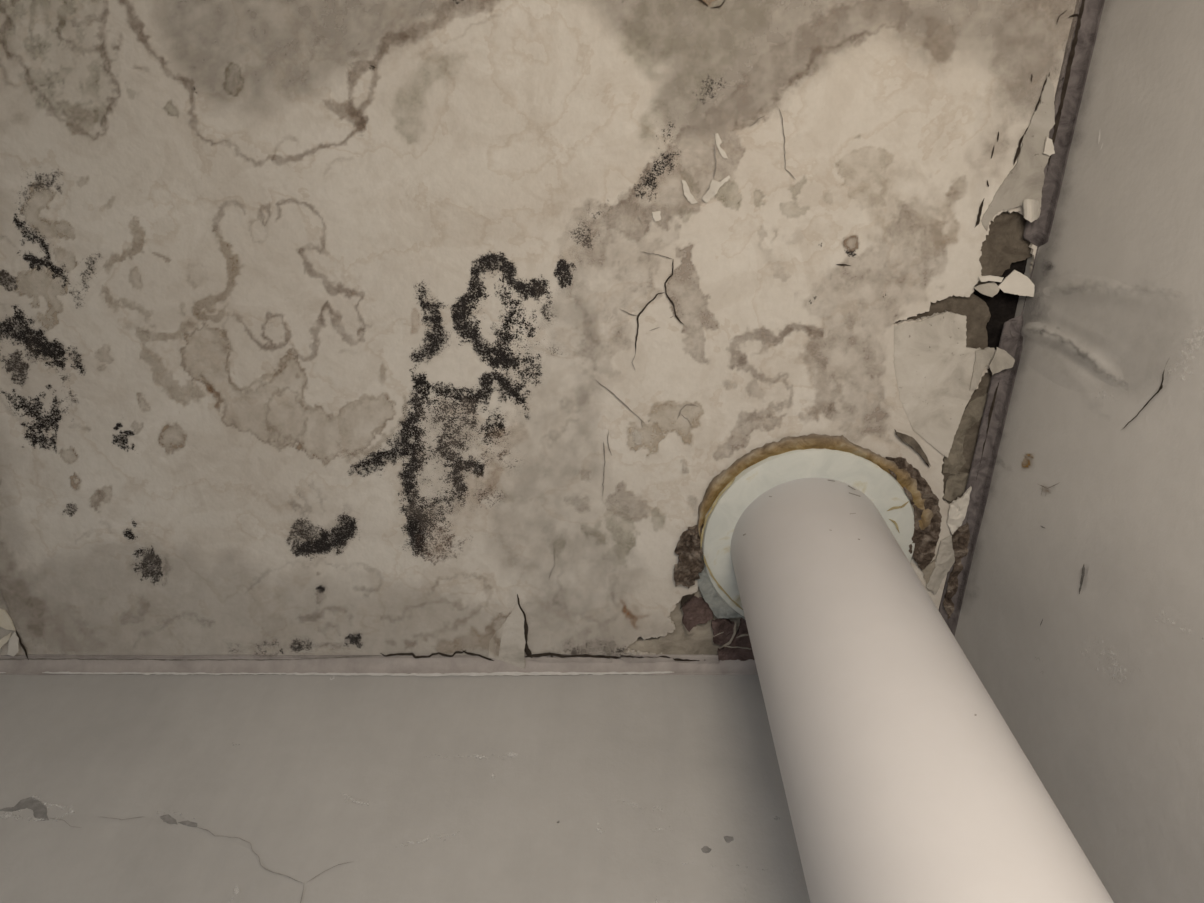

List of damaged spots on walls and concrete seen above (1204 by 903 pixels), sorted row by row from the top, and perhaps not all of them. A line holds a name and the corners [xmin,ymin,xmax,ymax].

crack [779,109,796,180]
water stain [0,169,100,451]
crack [619,217,684,369]
peeling [885,75,1055,619]
water stain [349,225,604,559]
water stain [112,423,135,451]
water stain [124,519,163,584]
water stain [286,513,358,561]
peeling [0,609,19,656]
crack [0,590,494,661]
spalling [43,524,755,680]
crack [525,652,699,661]